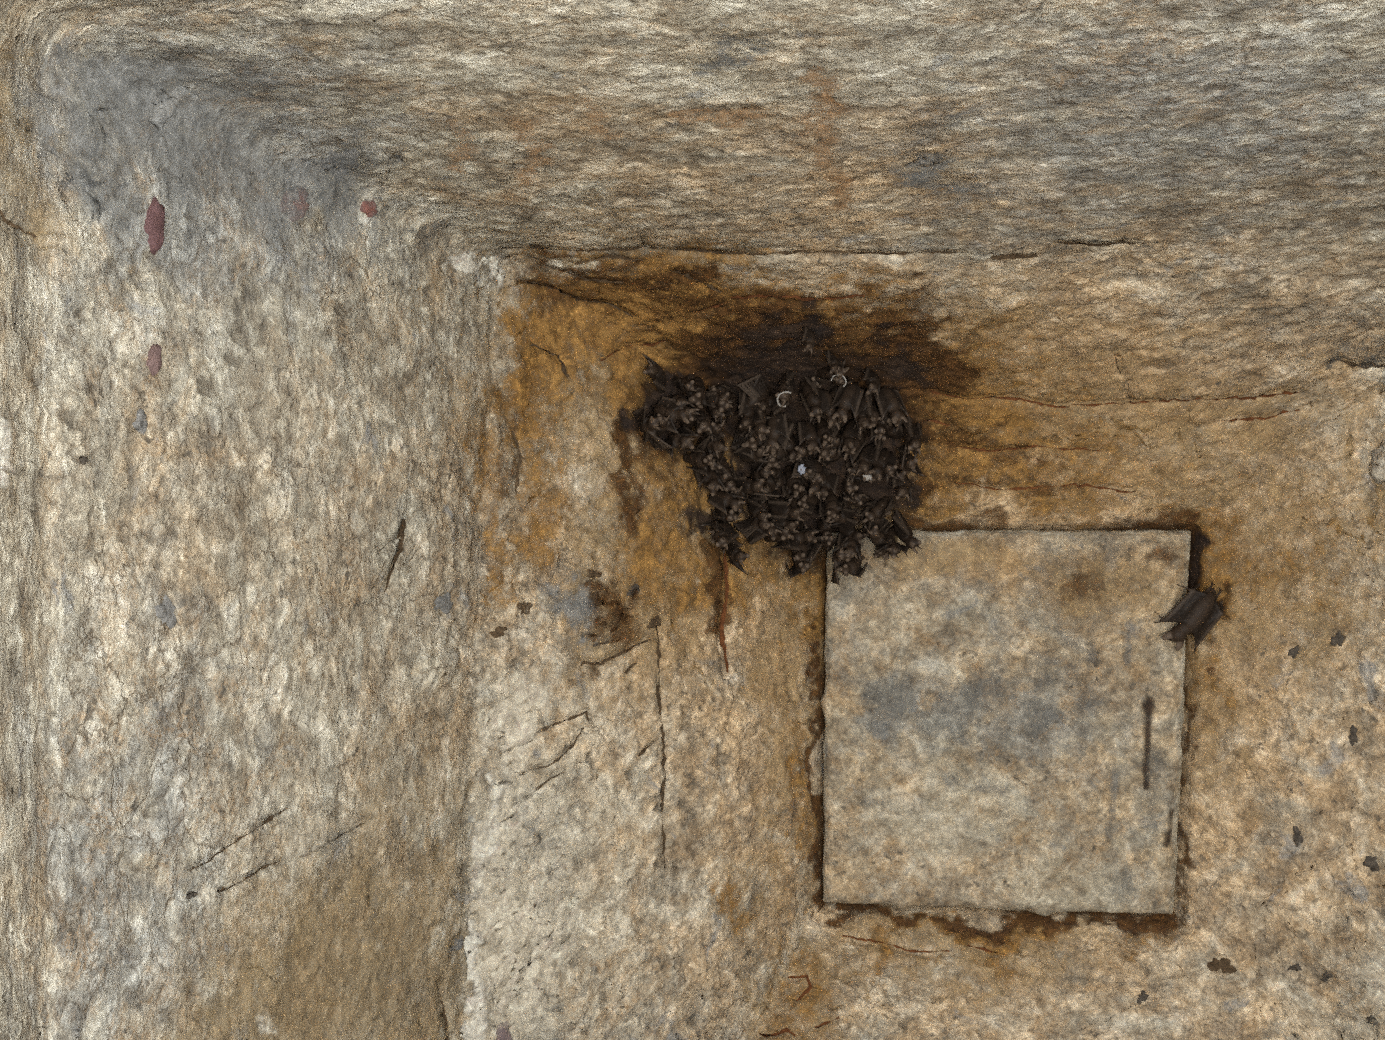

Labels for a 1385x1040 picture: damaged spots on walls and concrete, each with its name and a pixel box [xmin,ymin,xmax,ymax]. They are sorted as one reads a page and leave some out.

crack [0,210,37,238]
rust [463,244,1195,975]
rust [1106,508,1295,621]
rust [1182,658,1233,754]